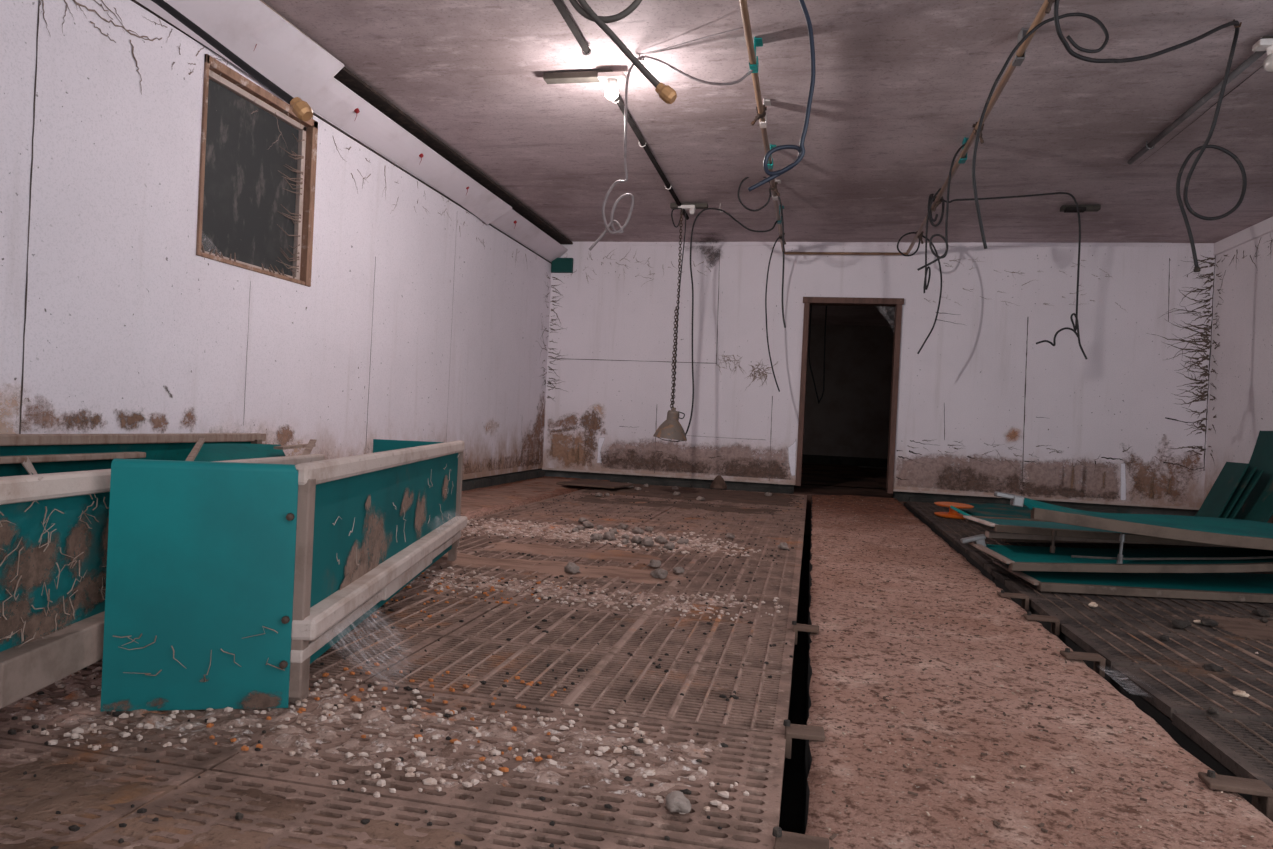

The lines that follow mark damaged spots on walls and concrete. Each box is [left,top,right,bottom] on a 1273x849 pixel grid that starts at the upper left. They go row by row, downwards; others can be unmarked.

damp [64,410,102,429]
damp [464,396,545,474]
damp [1124,444,1200,502]